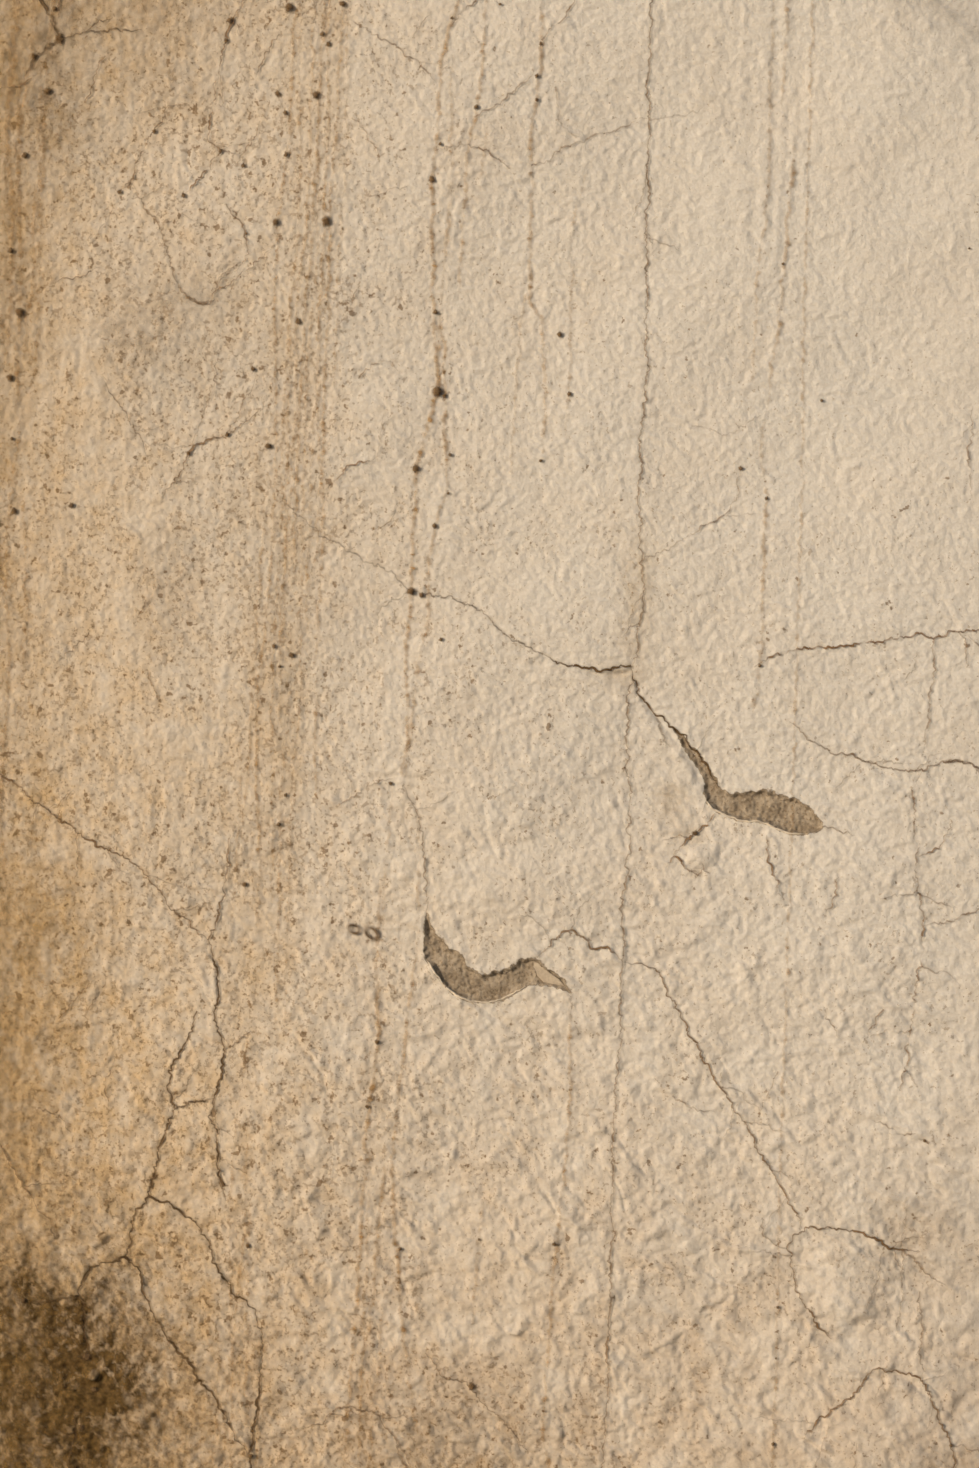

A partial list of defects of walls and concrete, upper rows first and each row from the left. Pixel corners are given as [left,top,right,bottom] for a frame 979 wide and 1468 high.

crack [12,0,128,98]
crack [431,0,907,1335]
crack [767,629,979,728]
flaking render [673,729,824,836]
crack [804,735,979,806]
flaking render [423,913,571,1004]
crack [870,847,979,1080]
crack [0,773,264,1468]
damp [0,1265,164,1468]
crack [601,1230,616,1468]
crack [812,1367,957,1468]